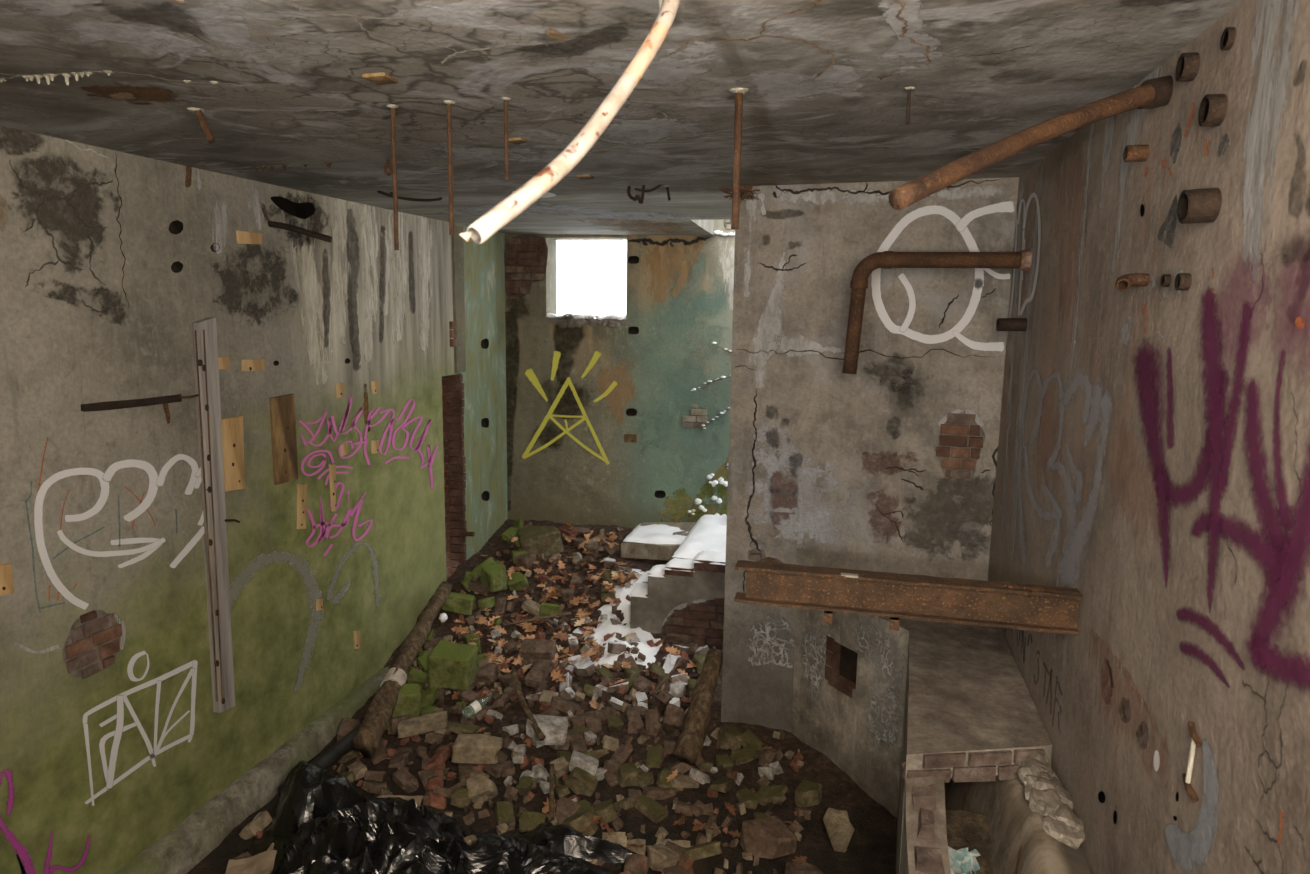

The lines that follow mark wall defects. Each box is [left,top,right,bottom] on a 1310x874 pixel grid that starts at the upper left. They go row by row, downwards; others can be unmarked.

crack [285,0,510,64]
crack [664,0,1069,82]
water stain [0,126,126,325]
water stain [212,186,495,385]
spalling [504,234,548,299]
water stain [520,203,710,220]
peeling [747,423,901,561]
crack [735,288,998,593]
peeling [863,452,917,474]
spalling [933,409,985,479]
spalling [14,610,126,679]
crack [1242,680,1304,874]